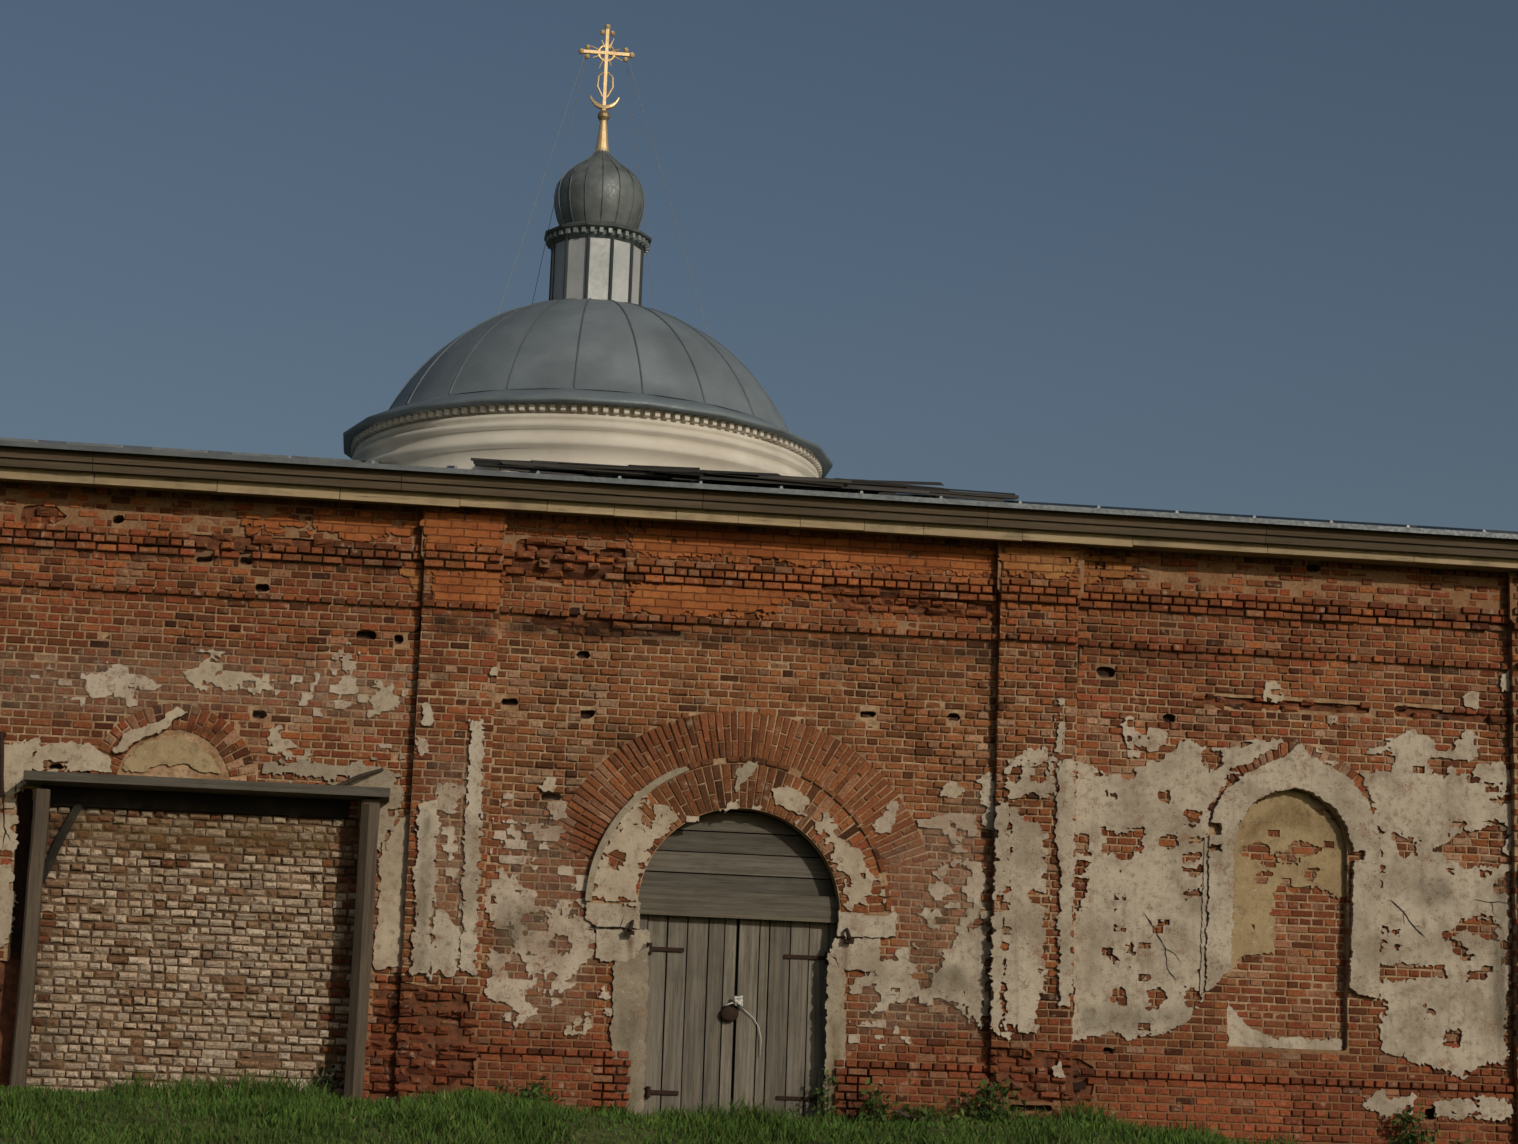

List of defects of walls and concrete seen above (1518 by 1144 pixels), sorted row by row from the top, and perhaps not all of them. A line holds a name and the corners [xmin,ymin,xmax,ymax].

peeling [22,661,162,708]
spalling [1096,668,1114,678]
spalling [1193,681,1368,728]
peeling [1500,667,1510,692]
flaking render [0,707,221,1088]
spalling [183,632,699,1103]
flaking render [719,761,894,912]
flaking render [848,715,1284,1112]
flaking render [1227,789,1345,977]
flaking render [1359,691,1518,1080]
flaking render [1227,1001,1343,1050]
flaking render [1359,1087,1517,1122]